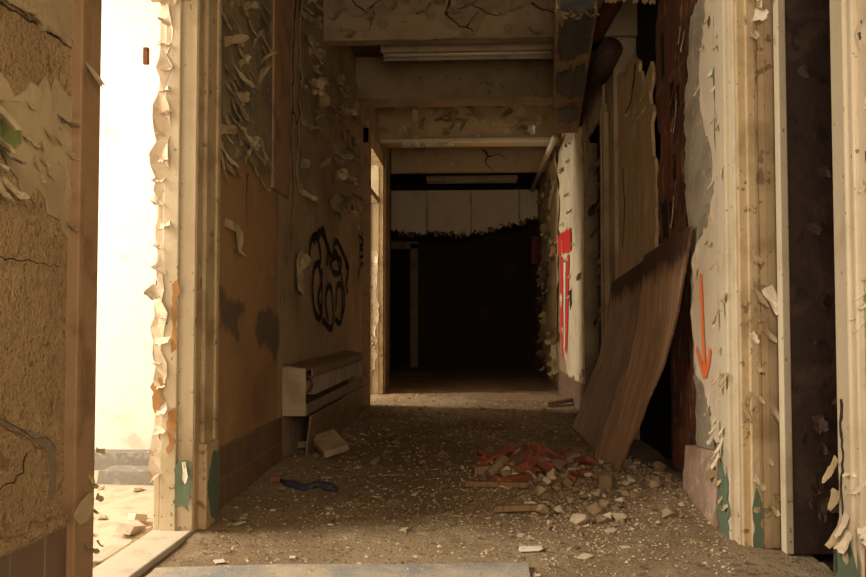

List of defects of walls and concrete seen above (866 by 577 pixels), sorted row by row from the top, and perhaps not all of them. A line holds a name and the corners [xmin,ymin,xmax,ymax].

crack [0,1,71,48]
peeling [5,0,78,49]
crack [444,0,503,36]
peeling [0,72,81,238]
peeling [220,0,278,192]
peeling [378,105,552,147]
peeling [855,0,866,281]
peeling [144,0,180,483]
peeling [88,473,104,514]
peeling [173,460,192,512]
peeling [207,446,221,519]
peeling [801,413,866,577]